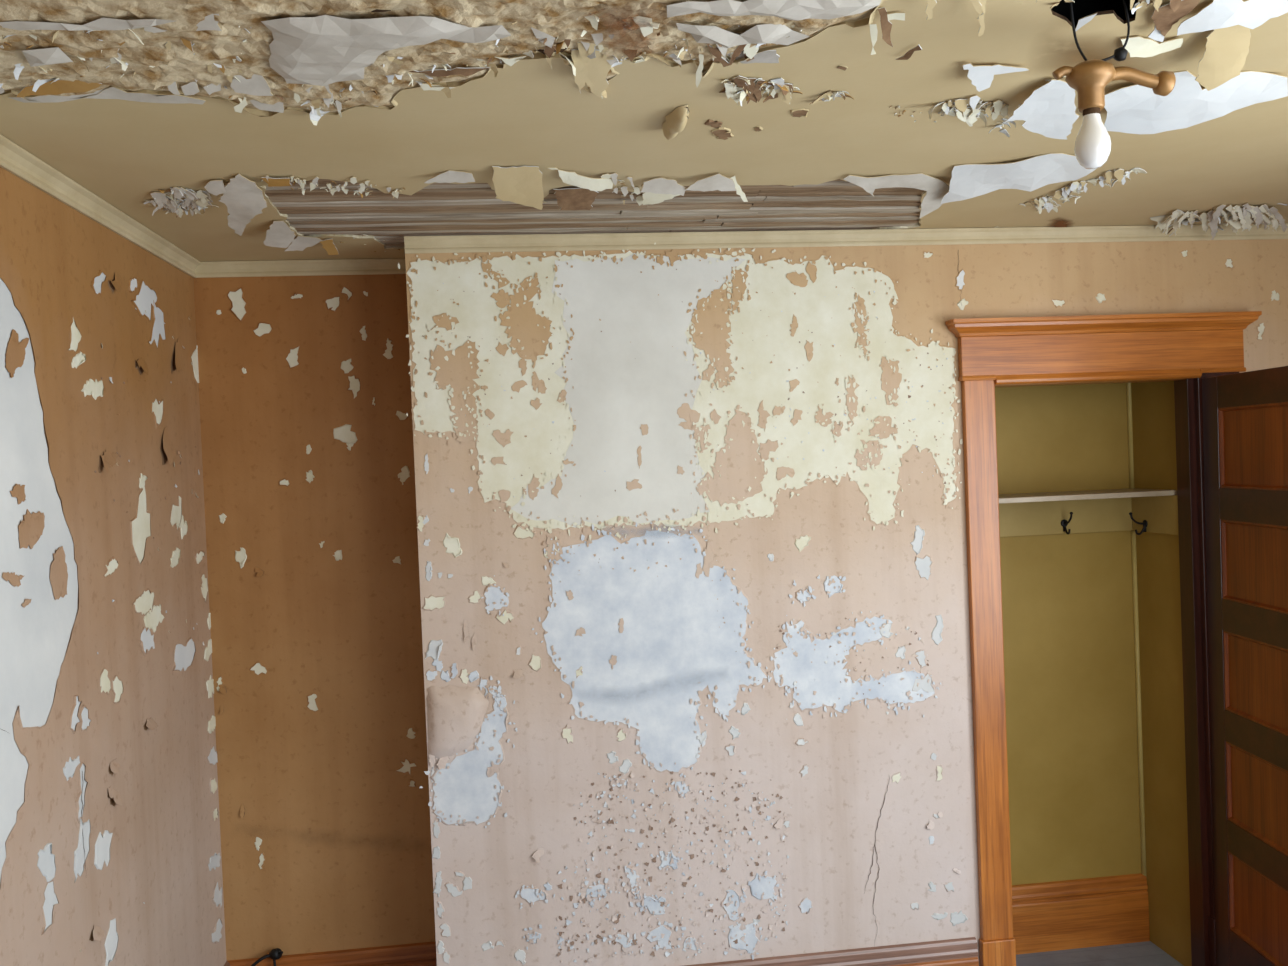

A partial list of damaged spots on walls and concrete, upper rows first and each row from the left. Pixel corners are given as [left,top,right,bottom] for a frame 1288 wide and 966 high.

flaking render [0,0,922,126]
peeling [1016,0,1288,134]
spalling [69,316,86,368]
spalling [81,377,125,400]
spalling [91,270,199,383]
peeling [143,63,1147,965]
peeling [0,277,79,889]
spalling [114,398,227,821]
spalling [99,669,123,704]
spalling [63,756,113,881]
spalling [37,843,59,935]
spalling [80,918,119,966]